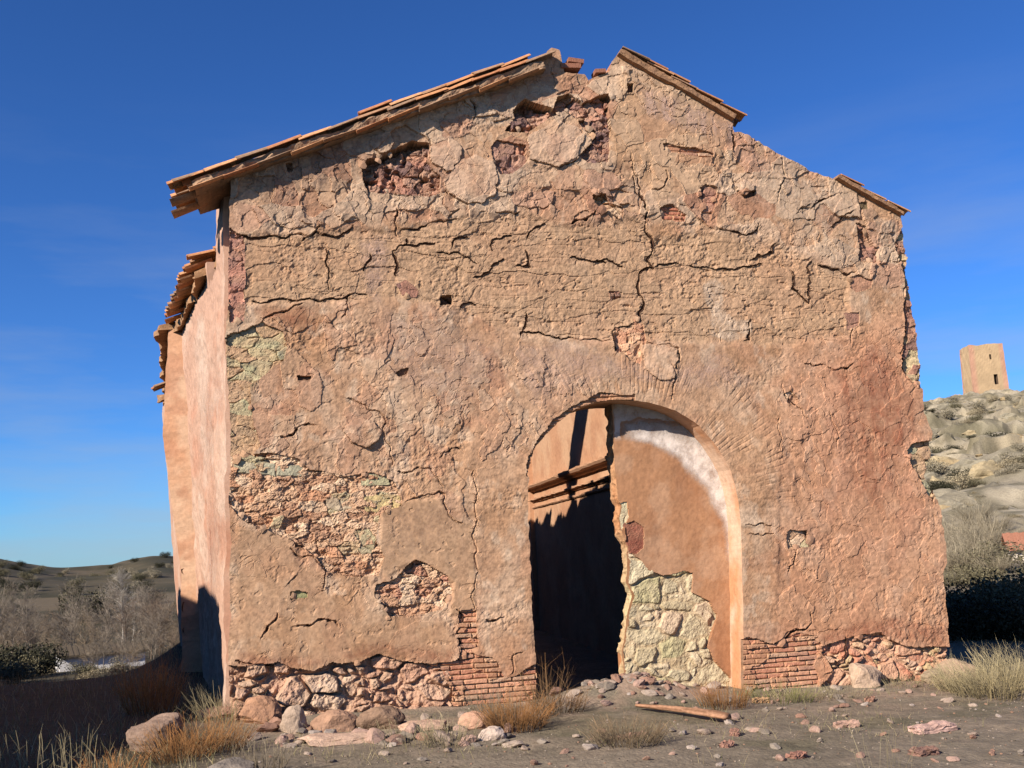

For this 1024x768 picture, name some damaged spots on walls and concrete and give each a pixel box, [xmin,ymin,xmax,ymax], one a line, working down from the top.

spalling [358,147,440,197]
spalling [490,92,615,174]
crack [234,212,545,317]
crack [520,169,773,349]
crack [791,261,854,304]
spalling [226,229,453,621]
leakage [614,404,729,549]
spalling [619,502,730,686]
spalling [228,608,537,721]
spalling [742,632,947,689]